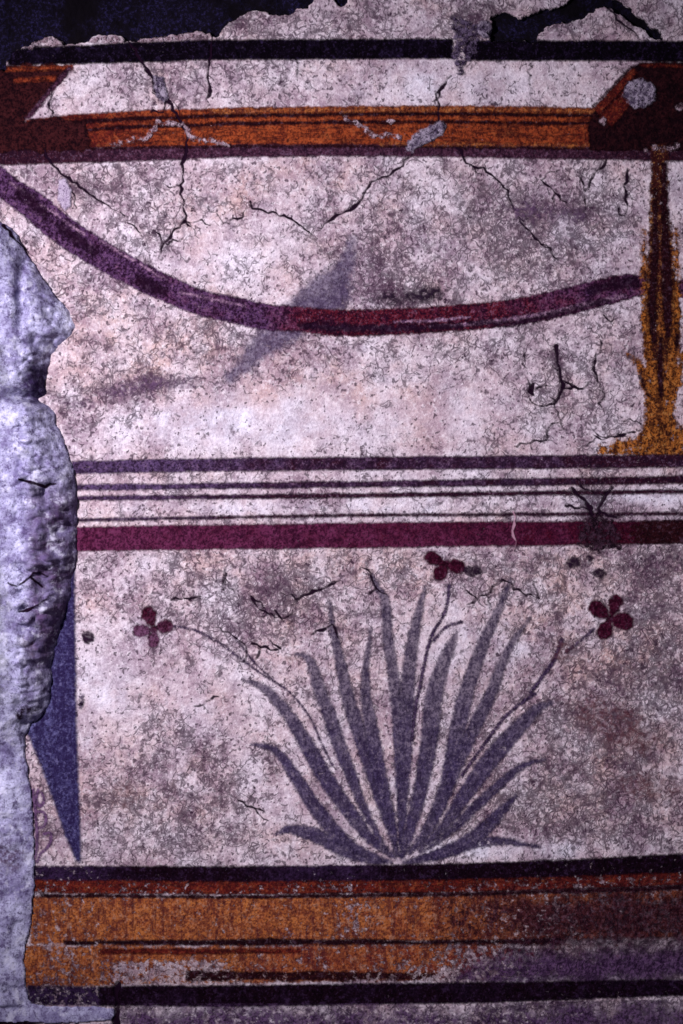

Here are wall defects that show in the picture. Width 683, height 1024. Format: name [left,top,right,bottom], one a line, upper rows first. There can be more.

flaking render [0,0,314,72]
flaking render [450,0,662,75]
crack [432,75,451,122]
flaking render [623,78,656,109]
crack [44,35,409,251]
flaking render [344,117,446,153]
crack [455,147,557,260]
crack [541,159,628,216]
crack [516,314,614,450]
crack [589,418,640,443]
crack [565,478,618,535]
crack [466,578,539,607]